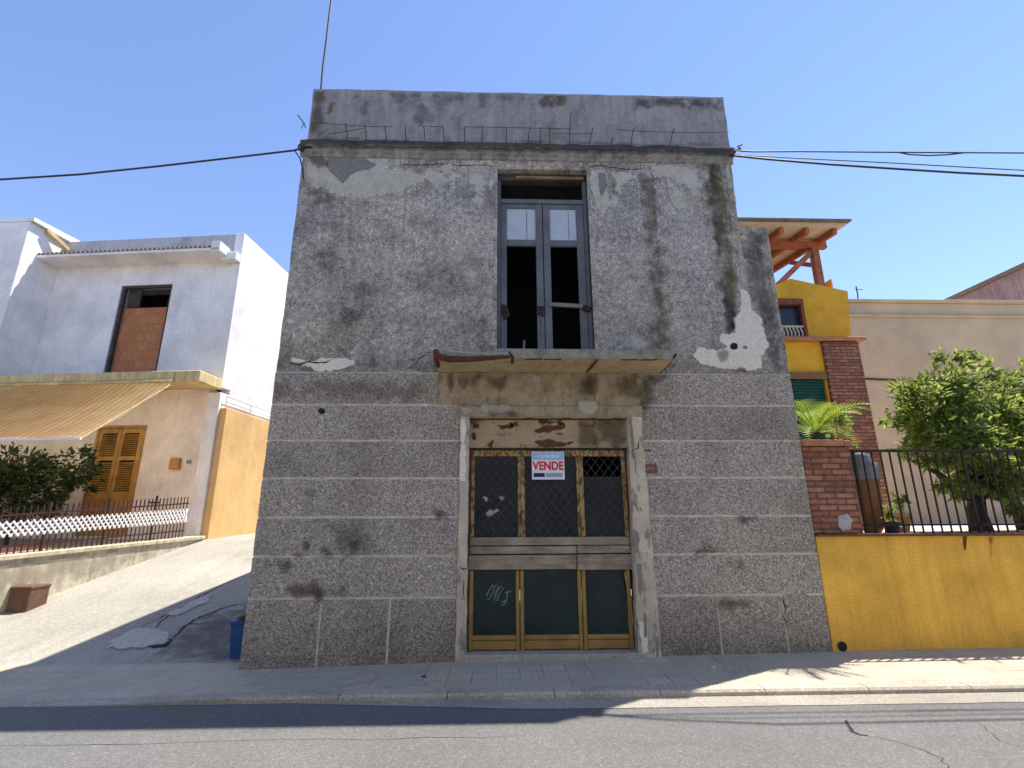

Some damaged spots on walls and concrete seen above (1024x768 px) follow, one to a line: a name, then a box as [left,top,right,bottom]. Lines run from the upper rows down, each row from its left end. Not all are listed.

peeling [301,157,495,209]
peeling [684,265,769,372]
peeling [291,344,361,372]
crack [142,574,247,639]
leakage [289,586,323,598]